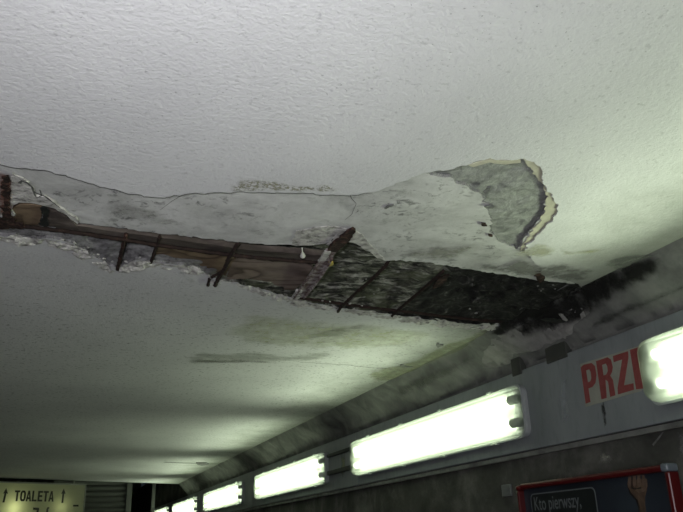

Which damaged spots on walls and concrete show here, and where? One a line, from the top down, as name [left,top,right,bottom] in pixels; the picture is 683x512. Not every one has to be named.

rust [0,174,26,230]
crack [2,165,210,210]
crack [228,192,365,220]
peeling [0,158,597,368]
damp [483,261,586,280]
damp [492,301,553,335]